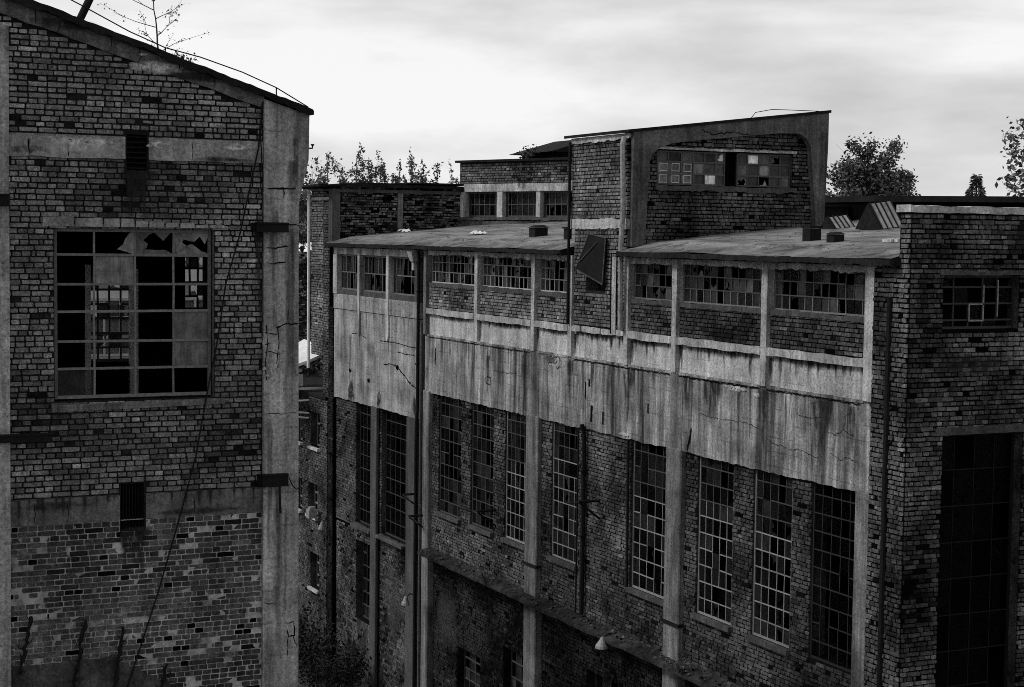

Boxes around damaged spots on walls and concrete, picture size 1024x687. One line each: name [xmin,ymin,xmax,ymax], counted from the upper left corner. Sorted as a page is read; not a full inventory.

crack [267,187,296,198]
crack [266,224,300,264]
leakage [434,314,754,388]
crack [352,333,860,473]
leakage [685,376,720,416]
leakage [758,389,768,419]
leakage [784,393,831,446]